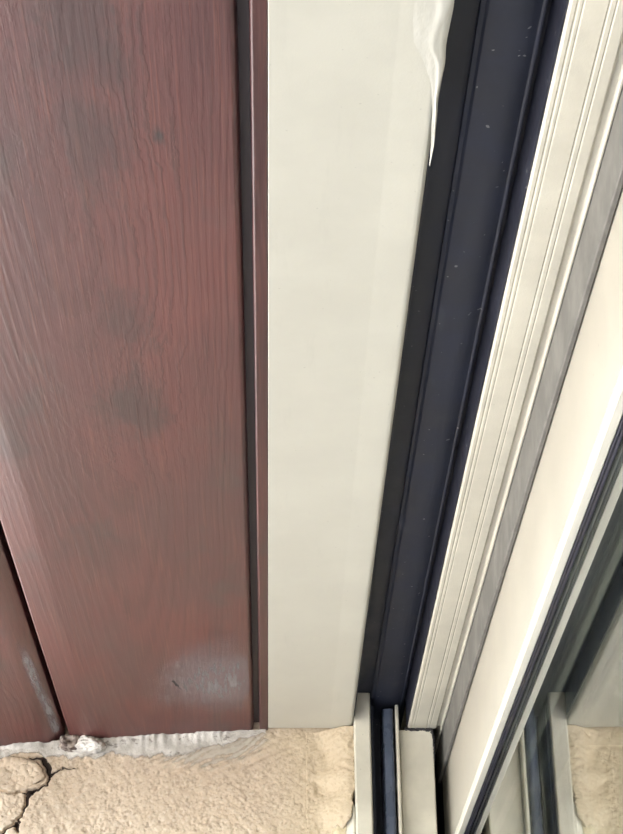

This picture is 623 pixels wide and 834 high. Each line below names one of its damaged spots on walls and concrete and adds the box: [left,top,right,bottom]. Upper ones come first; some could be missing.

crack [0,756,76,834]